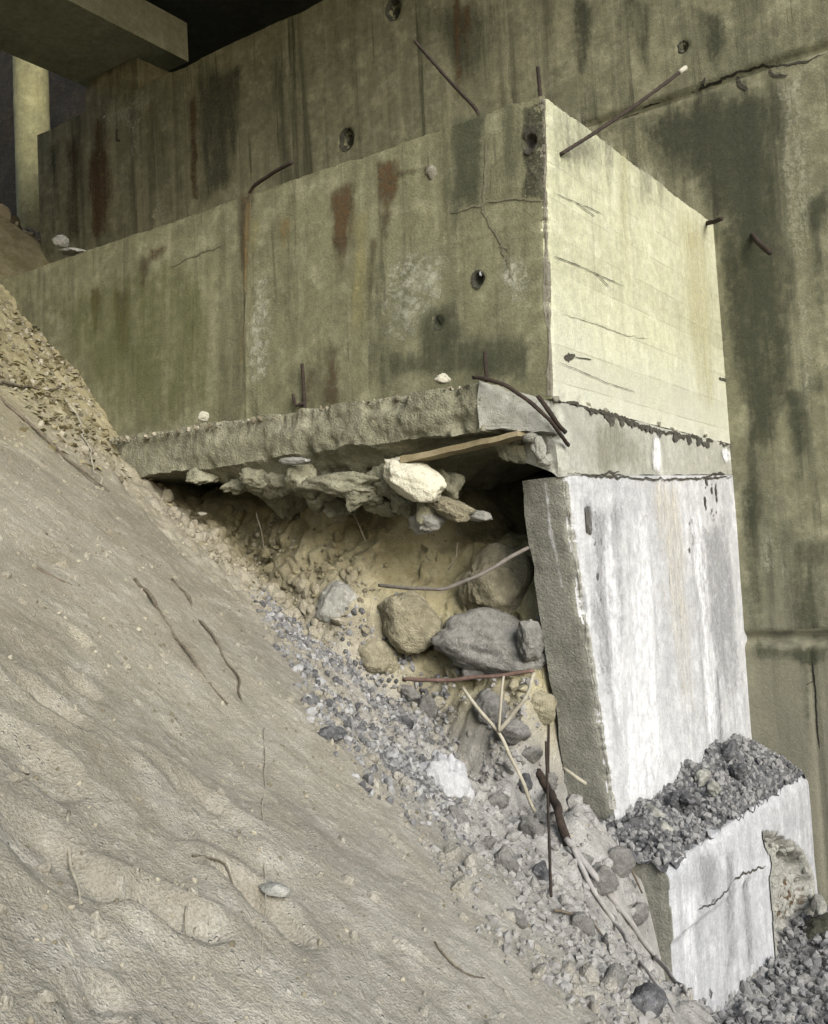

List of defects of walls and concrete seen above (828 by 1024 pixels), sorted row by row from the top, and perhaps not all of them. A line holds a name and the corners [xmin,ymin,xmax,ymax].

corrosion [50,115,109,238]
damp [199,67,240,195]
corrosion [332,186,352,254]
crack [619,52,828,120]
damp [646,79,826,601]
crack [552,362,734,481]
crack [699,866,765,910]
spalling [762,829,815,959]